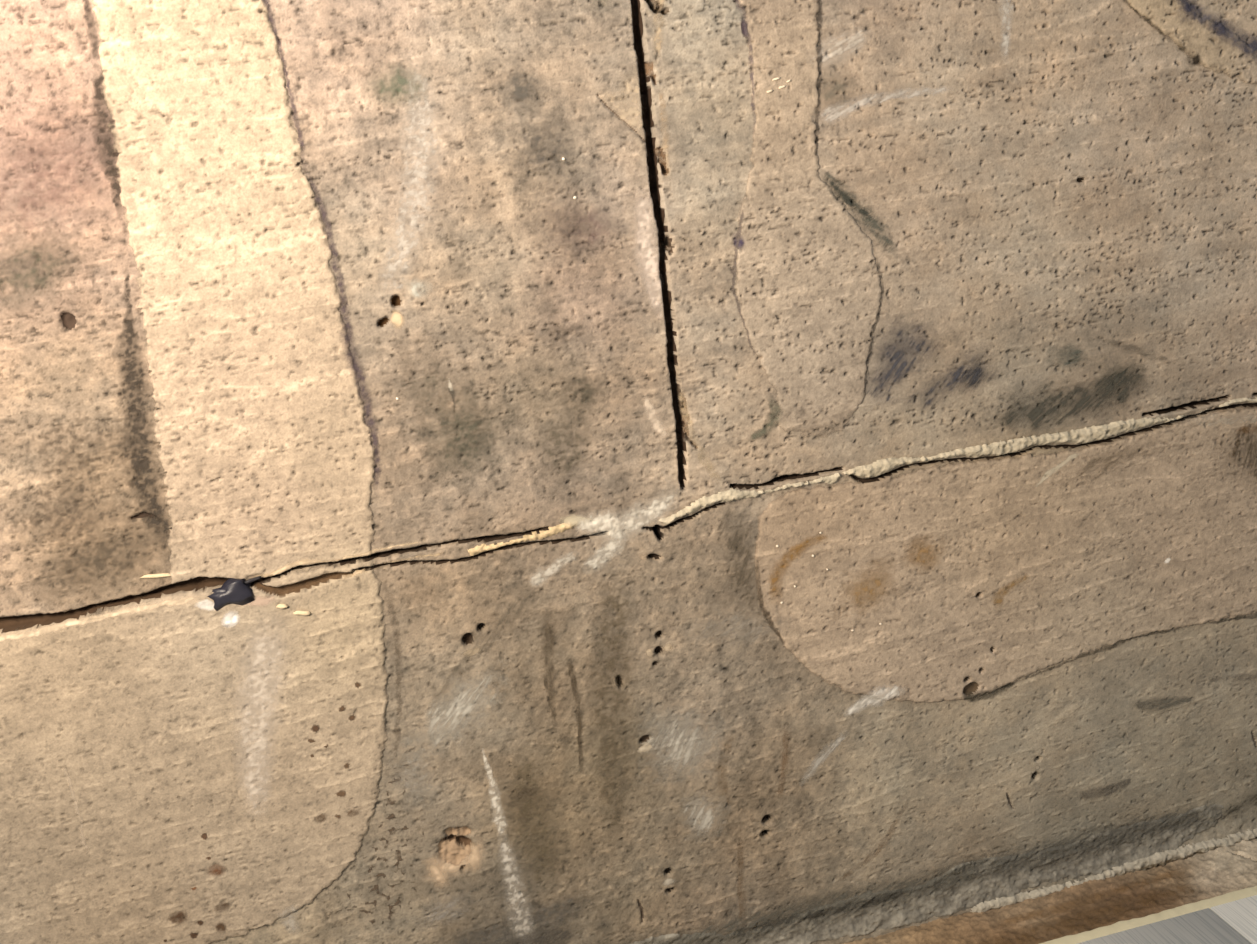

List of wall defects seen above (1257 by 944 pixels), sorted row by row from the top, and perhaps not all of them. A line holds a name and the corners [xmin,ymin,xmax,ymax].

crack [597,0,1257,540]
crack [131,512,154,520]
crack [0,527,607,633]